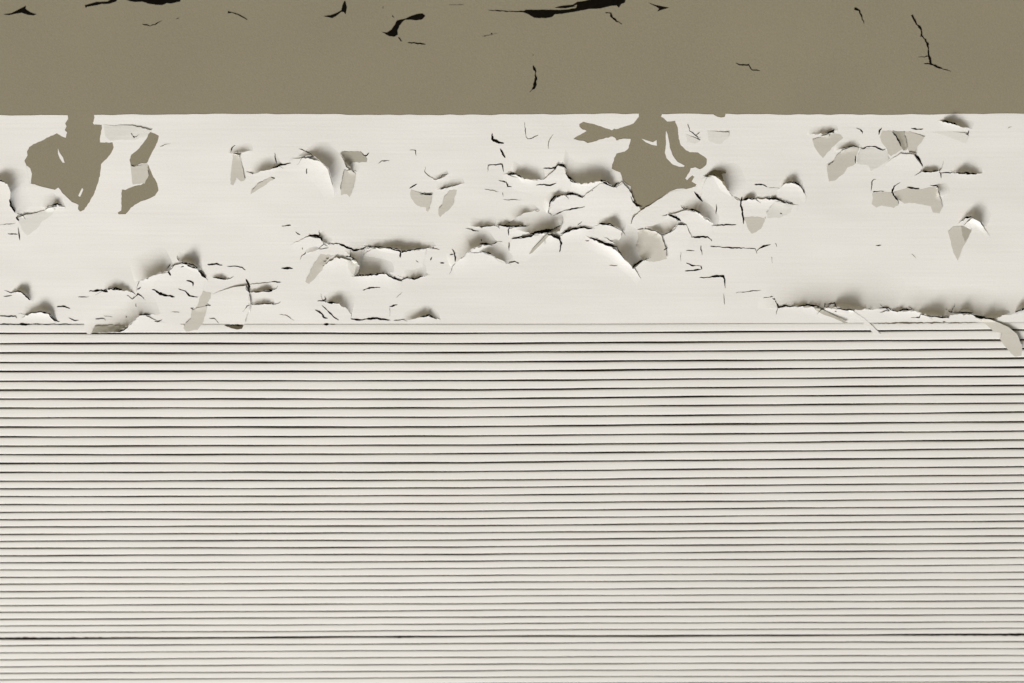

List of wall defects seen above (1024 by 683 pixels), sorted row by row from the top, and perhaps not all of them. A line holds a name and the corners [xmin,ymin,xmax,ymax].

crack [383,13,425,45]
crack [483,0,625,37]
peeling [0,111,166,236]
peeling [228,142,369,202]
crack [488,122,567,194]
peeling [807,119,983,213]
peeling [291,111,807,312]
peeling [958,203,991,226]
crack [680,224,777,304]
crack [0,305,110,326]
crack [127,280,195,322]
crack [873,319,976,327]